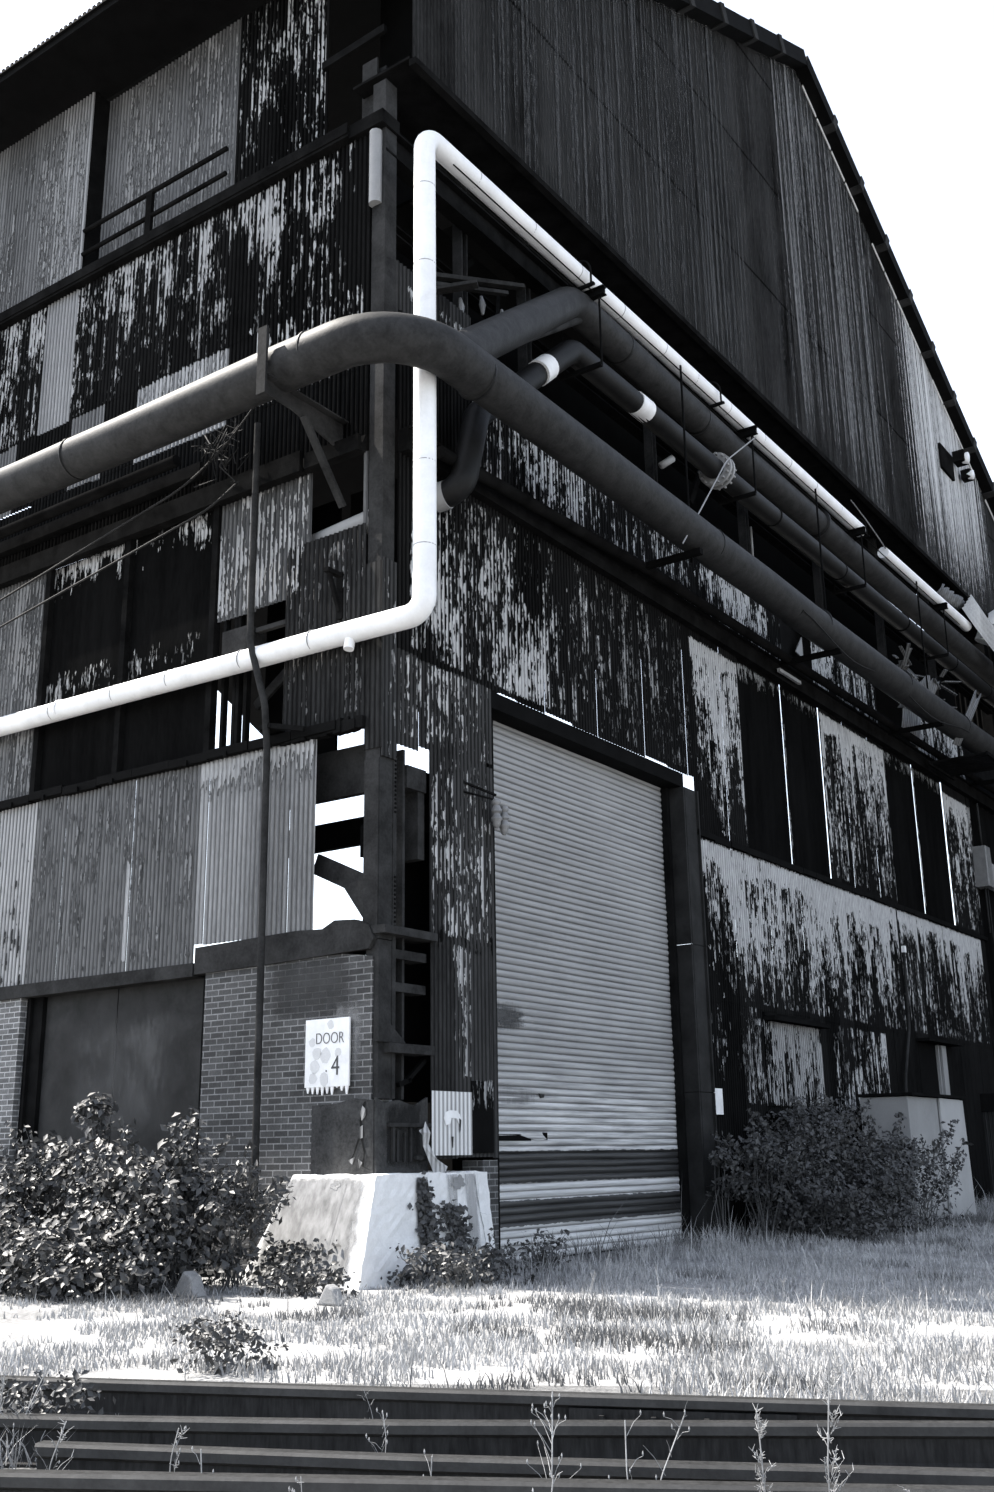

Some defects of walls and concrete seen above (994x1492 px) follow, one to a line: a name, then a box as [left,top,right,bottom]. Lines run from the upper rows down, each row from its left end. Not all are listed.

peeling [0,0,364,450]
peeling [0,474,363,721]
peeling [480,419,781,658]
peeling [0,728,33,798]
peeling [387,500,990,1159]